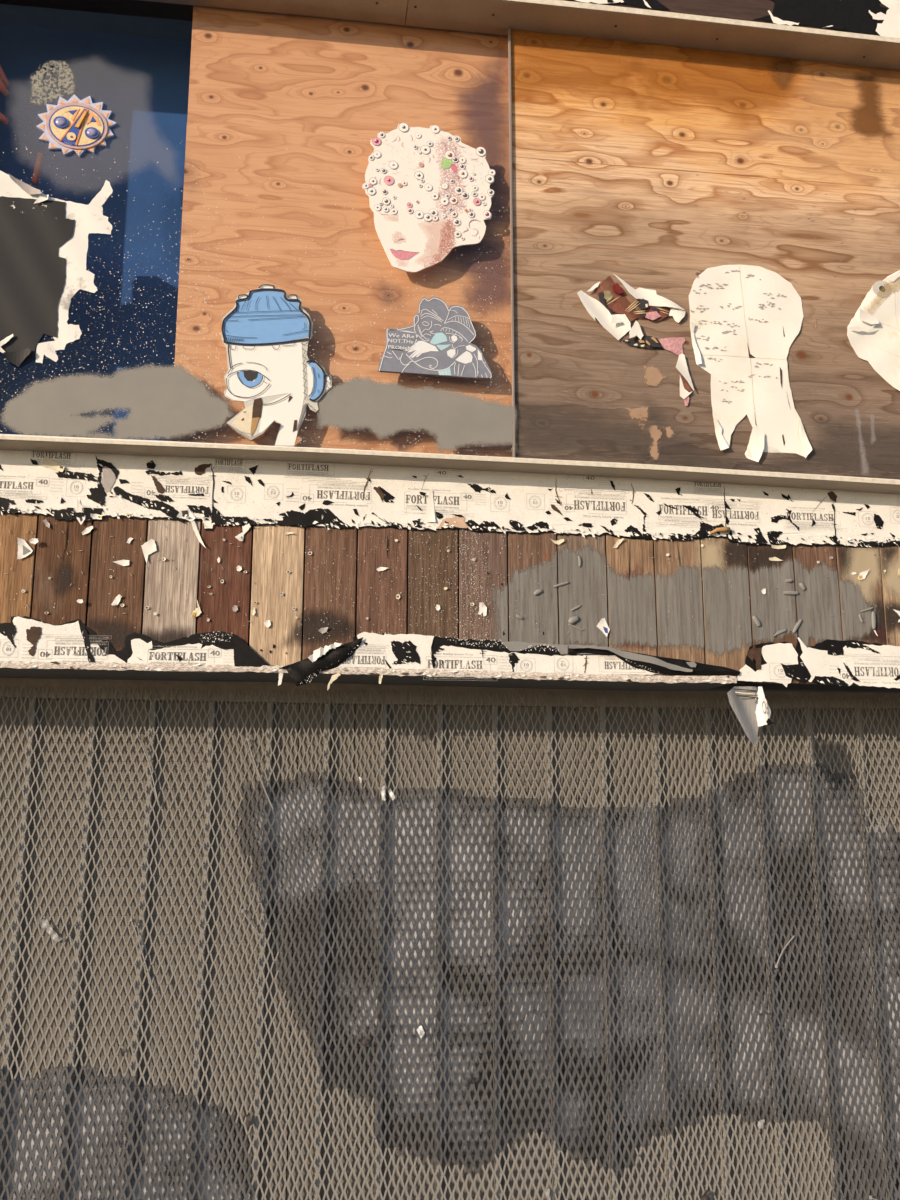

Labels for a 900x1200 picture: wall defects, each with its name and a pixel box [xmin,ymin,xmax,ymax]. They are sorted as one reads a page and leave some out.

leakage [852,76,889,136]
peeling [64,464,169,510]
peeling [438,515,491,530]
peeling [859,607,876,629]